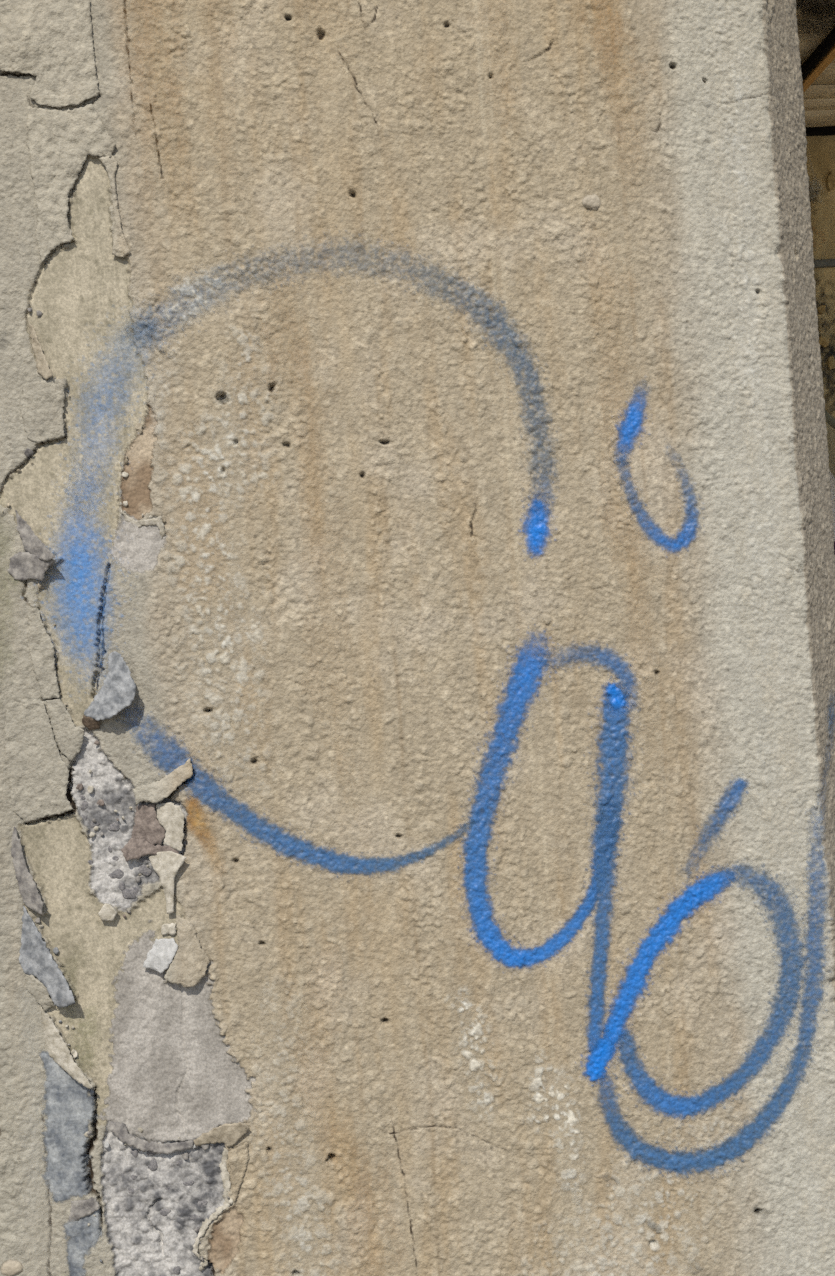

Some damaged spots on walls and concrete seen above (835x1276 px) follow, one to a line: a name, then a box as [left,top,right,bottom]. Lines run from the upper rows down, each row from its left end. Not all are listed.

peeling [0,155,256,1276]